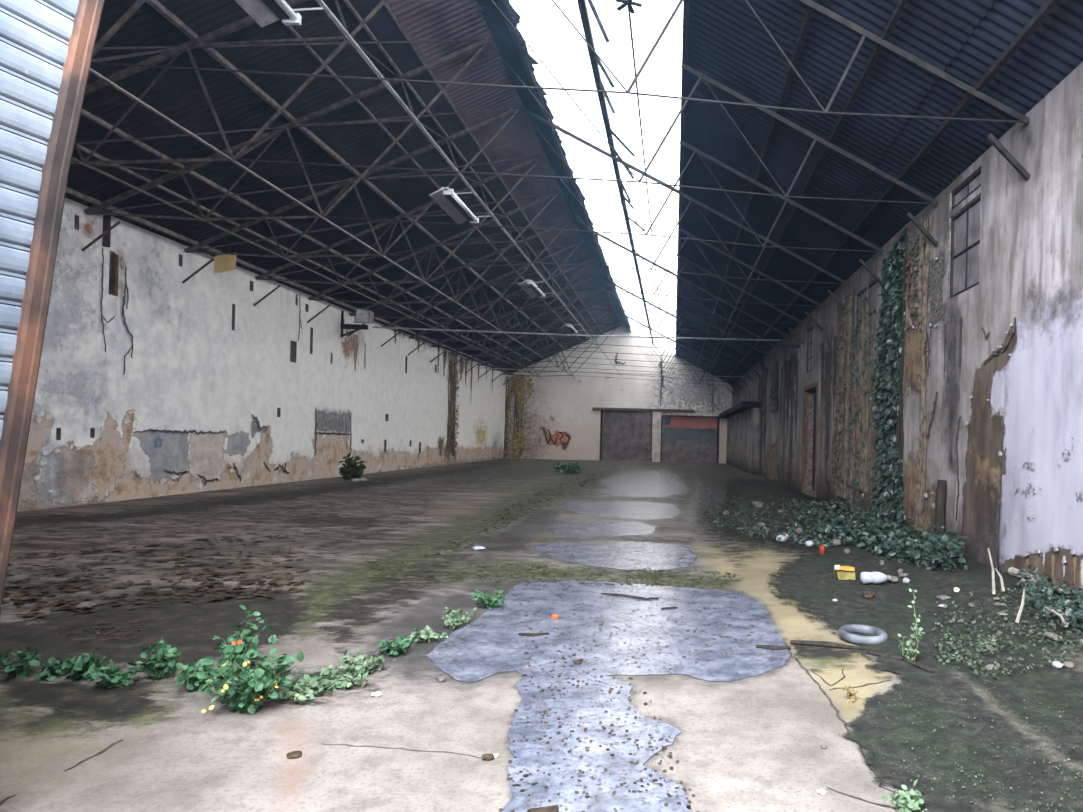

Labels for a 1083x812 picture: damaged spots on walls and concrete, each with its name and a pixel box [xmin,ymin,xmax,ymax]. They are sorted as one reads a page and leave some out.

crack [100,248,133,375]
flaking render [19,408,318,506]
peeling [961,292,1083,597]
crack [784,643,901,808]